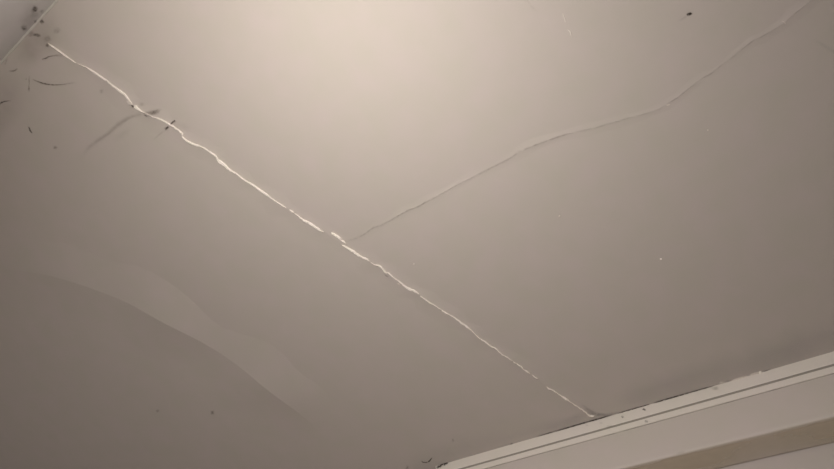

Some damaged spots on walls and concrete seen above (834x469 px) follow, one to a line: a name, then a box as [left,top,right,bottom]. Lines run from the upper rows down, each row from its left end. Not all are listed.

crack [48,42,708,436]